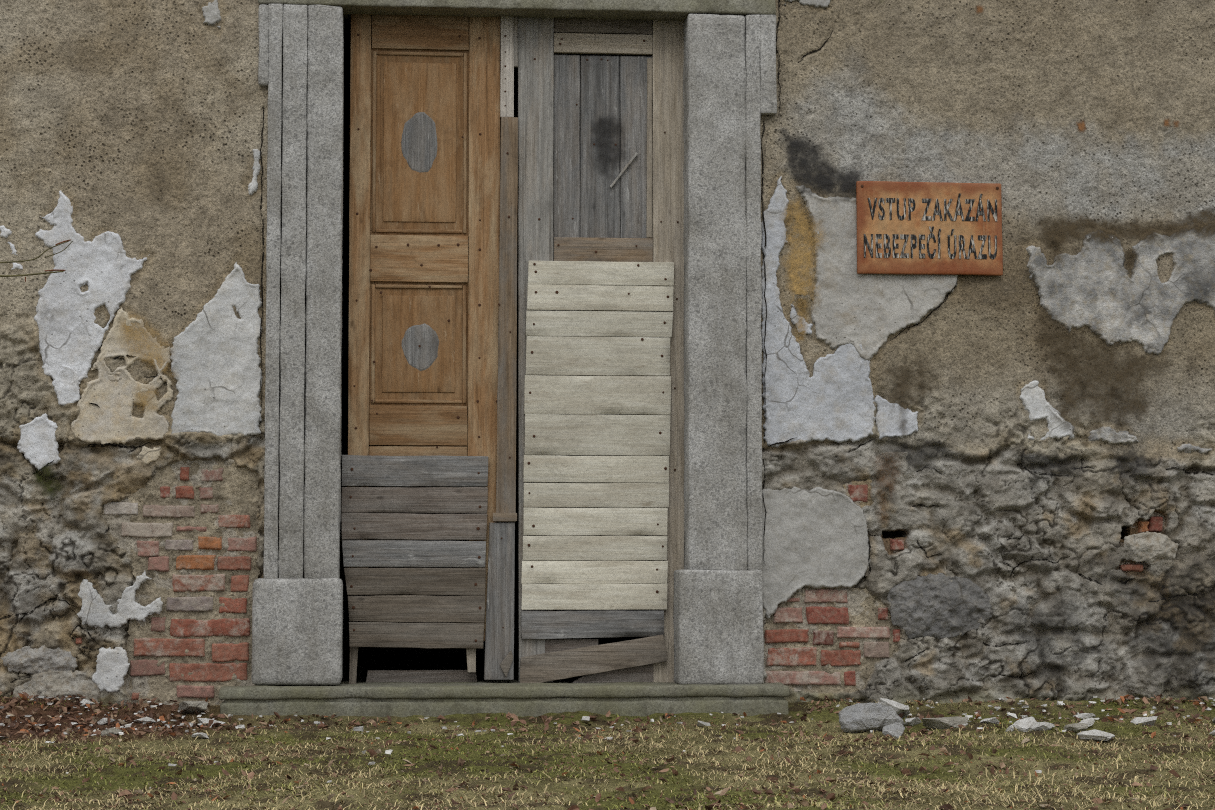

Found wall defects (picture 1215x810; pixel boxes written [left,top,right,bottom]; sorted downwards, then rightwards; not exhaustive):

flaking render [248,149,261,195]
flaking render [761,176,958,447]
flaking render [1026,229,1215,356]
flaking render [1020,380,1139,445]
flaking render [17,190,263,705]
flaking render [843,479,873,508]
flaking render [881,529,907,554]
flaking render [1116,511,1165,576]
flaking render [763,588,902,693]